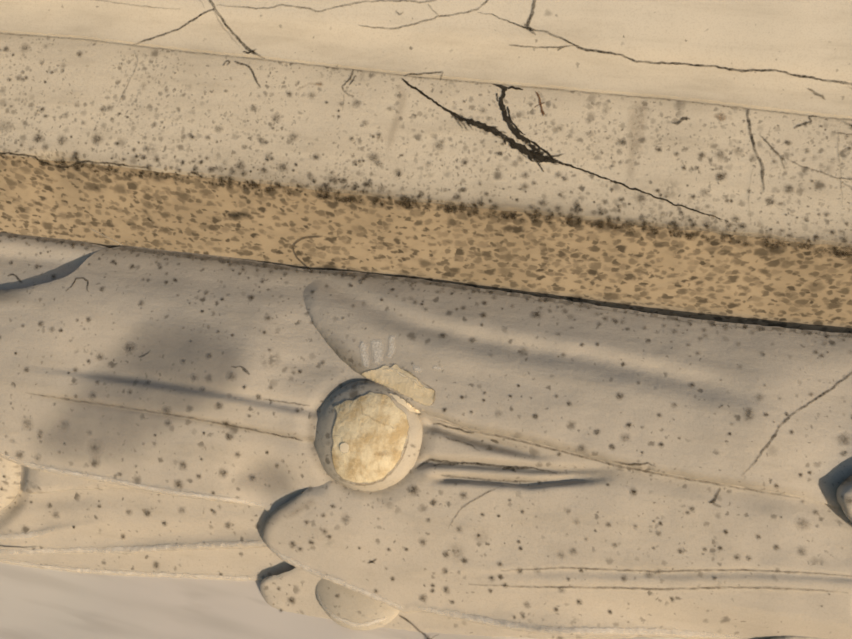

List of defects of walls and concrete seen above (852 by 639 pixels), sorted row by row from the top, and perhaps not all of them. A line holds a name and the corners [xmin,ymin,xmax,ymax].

crack [143,0,258,84]
crack [486,0,535,47]
crack [551,38,635,61]
crack [656,62,844,97]
crack [402,72,726,221]
crack [747,113,778,180]
mould [400,189,580,224]
peeling [332,364,435,483]
crack [763,376,848,450]